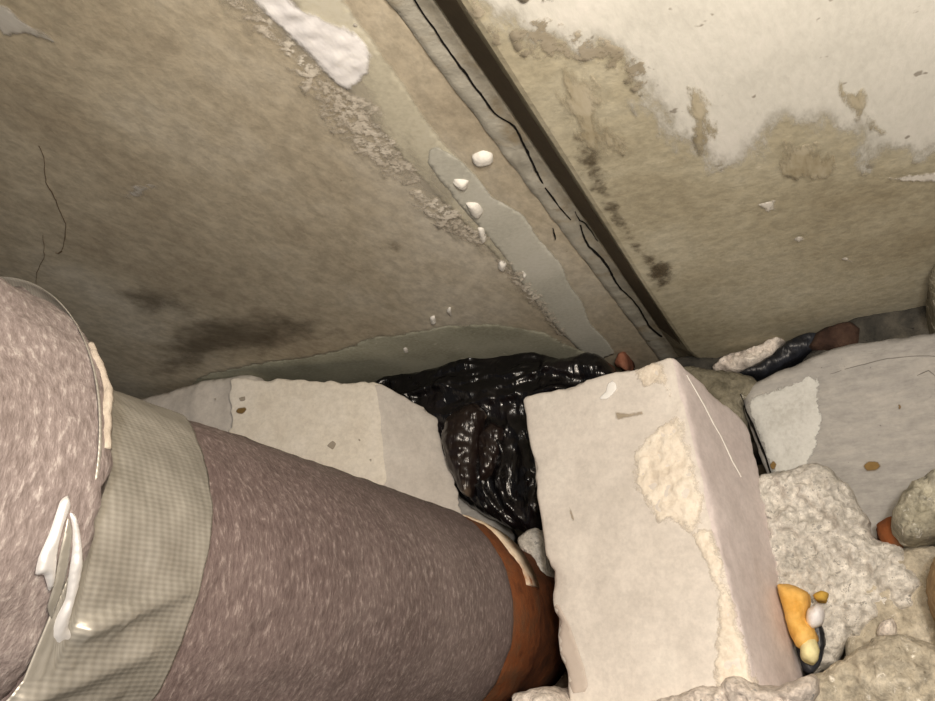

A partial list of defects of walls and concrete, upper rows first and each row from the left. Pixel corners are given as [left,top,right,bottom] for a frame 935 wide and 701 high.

crack [36,146,66,278]
efflorescence [227,0,484,244]
damp [435,0,680,344]
peeling [467,0,935,173]
peeling [899,173,935,182]
damp [181,322,288,352]